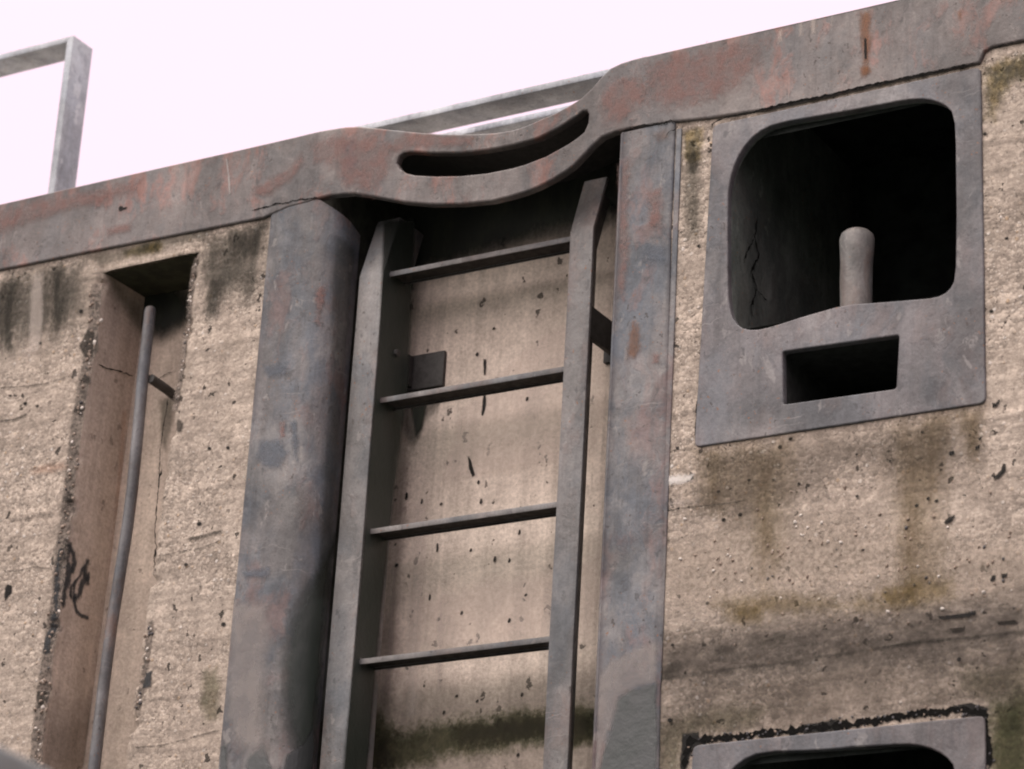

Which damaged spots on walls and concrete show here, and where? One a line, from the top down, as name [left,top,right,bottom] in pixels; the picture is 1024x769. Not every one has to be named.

rust [861,13,869,73]
crack [254,197,317,210]
crack [743,221,766,317]
crack [153,372,221,568]